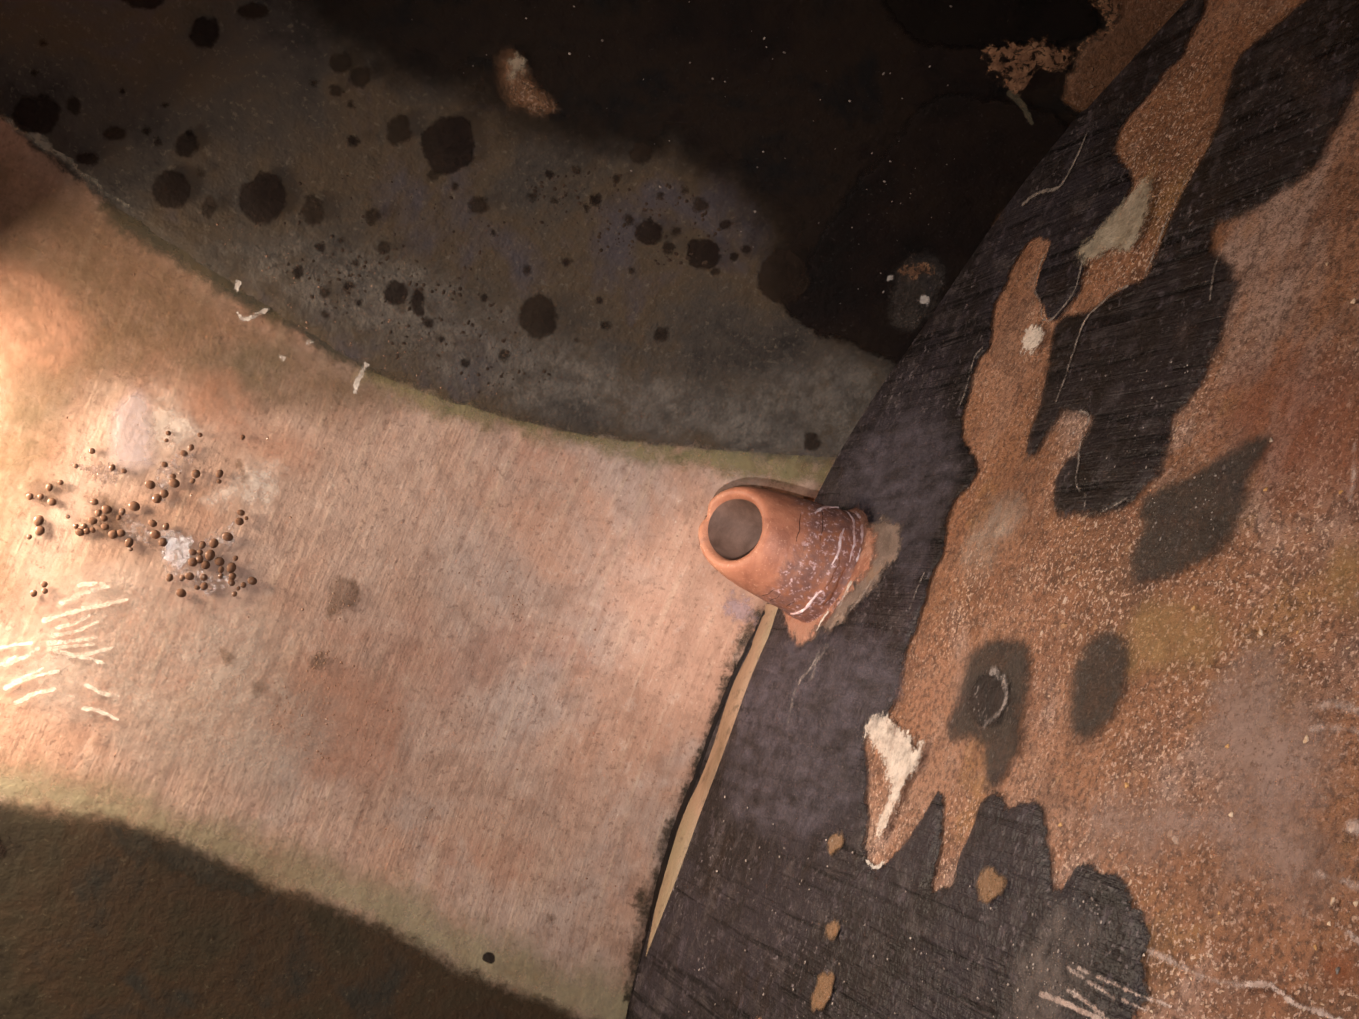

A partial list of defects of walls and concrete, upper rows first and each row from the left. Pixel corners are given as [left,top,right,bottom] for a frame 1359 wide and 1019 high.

flaking render [980,0,1187,124]
damp [0,0,949,565]
spalling [887,257,943,330]
damp [96,512,237,596]
rust [783,507,877,645]
damp [1,582,128,703]
damp [730,581,924,837]
damp [0,774,631,1019]
flaking render [826,920,840,940]
flaking render [828,833,843,855]
flaking render [977,867,1006,903]
flaking render [811,972,834,1011]